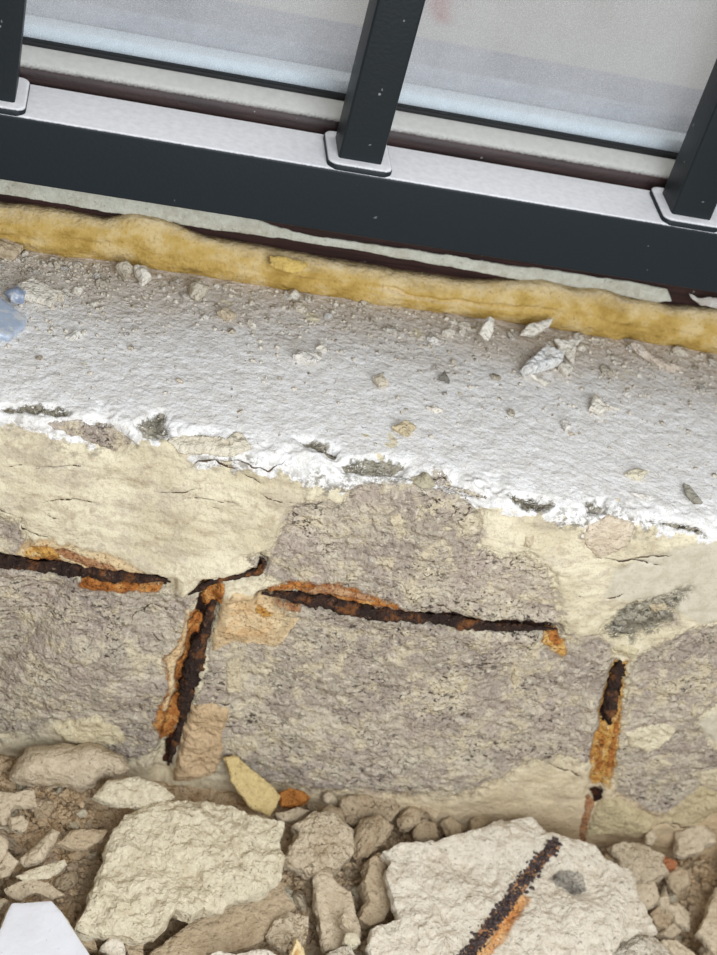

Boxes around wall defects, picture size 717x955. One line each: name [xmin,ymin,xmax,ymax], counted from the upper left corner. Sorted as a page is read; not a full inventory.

spalling [2,403,131,451]
flaking render [137,413,251,457]
spalling [0,517,171,584]
rust [14,539,168,593]
spalling [167,441,717,836]
rust [489,619,567,656]
rust [153,579,476,764]
flaking render [54,714,125,745]
rust [580,660,629,842]